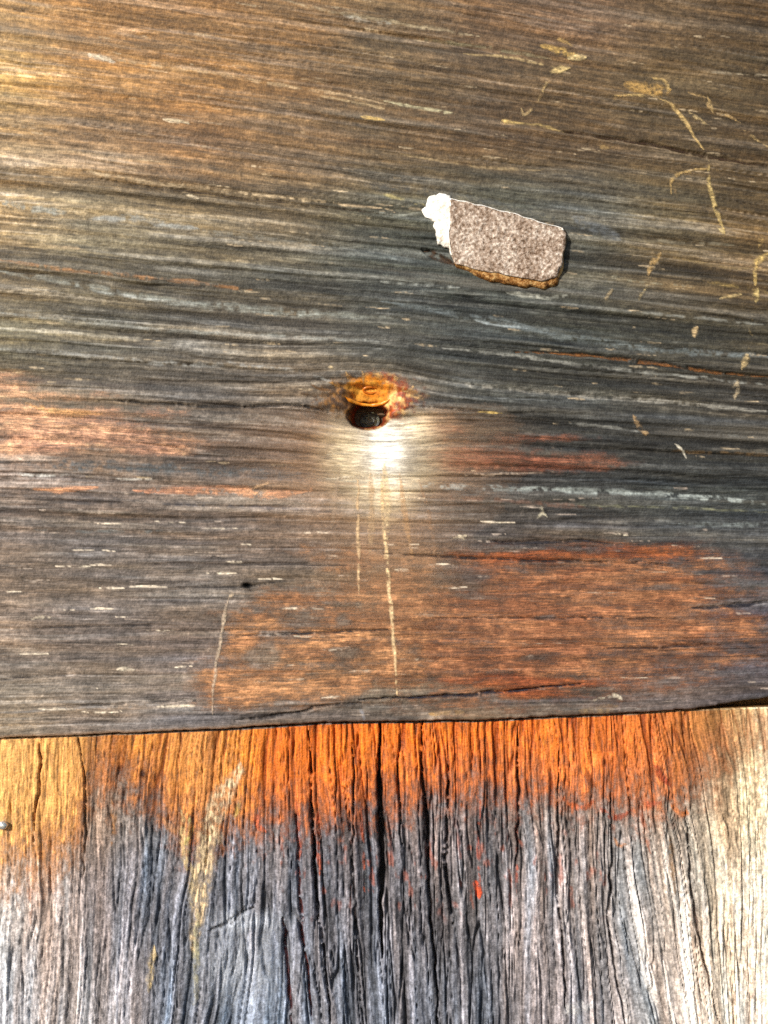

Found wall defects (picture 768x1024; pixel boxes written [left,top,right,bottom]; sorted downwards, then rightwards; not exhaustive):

rust [301,371,418,430]
crack [240,684,574,1023]
crack [606,799,625,1023]
crack [688,872,710,985]